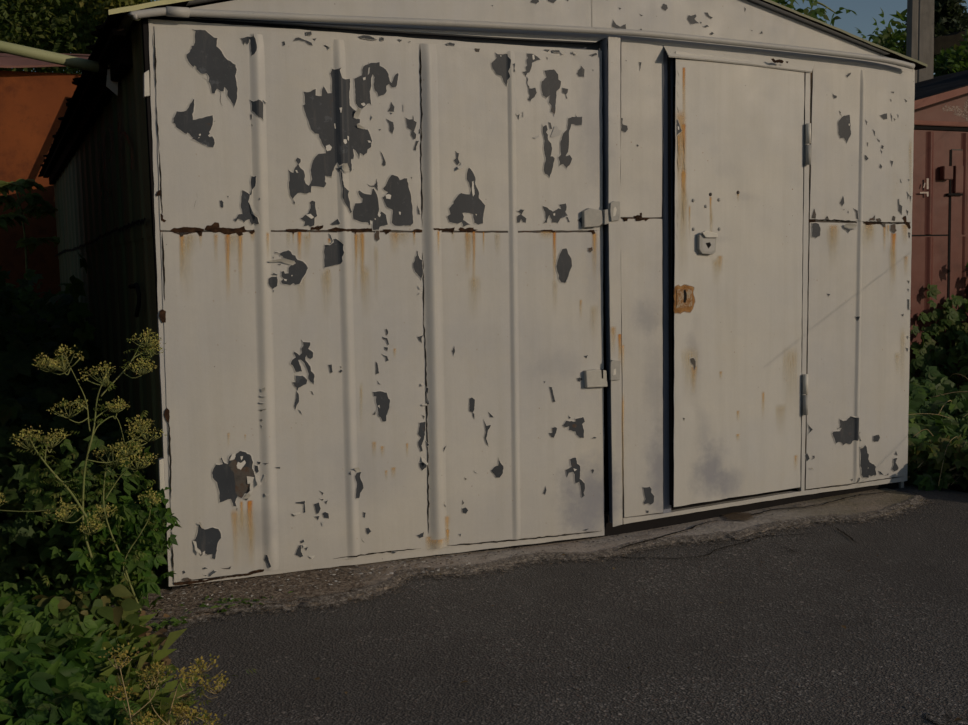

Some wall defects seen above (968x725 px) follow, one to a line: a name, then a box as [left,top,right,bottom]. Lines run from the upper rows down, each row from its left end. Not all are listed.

peeling [172,98,216,148]
peeling [185,28,268,126]
peeling [288,61,421,242]
peeling [491,49,583,178]
peeling [446,151,486,227]
corrosion [161,214,255,264]
peeling [268,249,309,293]
corrosion [413,227,484,253]
peeling [290,340,315,414]
peeling [211,450,280,509]
peeling [831,415,899,482]
spalling [138,522,366,625]